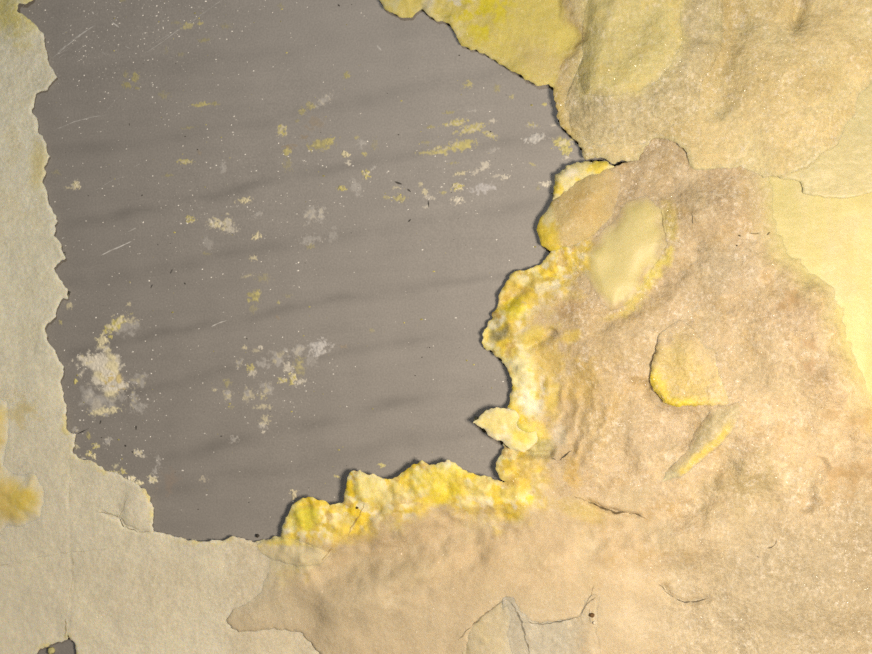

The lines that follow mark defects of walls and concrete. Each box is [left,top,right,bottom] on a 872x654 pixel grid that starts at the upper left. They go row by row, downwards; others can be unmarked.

peeling [434,111,495,156]
peeling [521,133,573,156]
peeling [450,171,496,204]
peeling [208,213,237,232]
peeling [308,337,334,357]
peeling [71,314,129,417]
peeling [279,362,307,385]
peeling [473,407,538,452]
peeling [109,468,158,494]